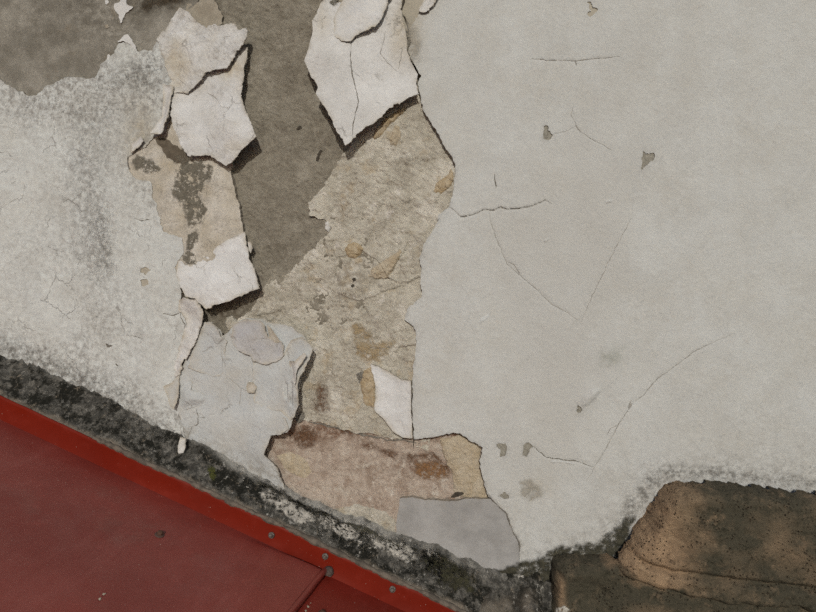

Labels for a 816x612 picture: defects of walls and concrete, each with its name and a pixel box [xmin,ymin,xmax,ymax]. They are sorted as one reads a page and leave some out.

crack [532,56,620,66]
flaking render [128,0,489,532]
crack [450,200,631,322]
damp [353,324,392,361]
crack [533,337,725,481]
damp [257,482,416,560]
damp [499,500,635,582]